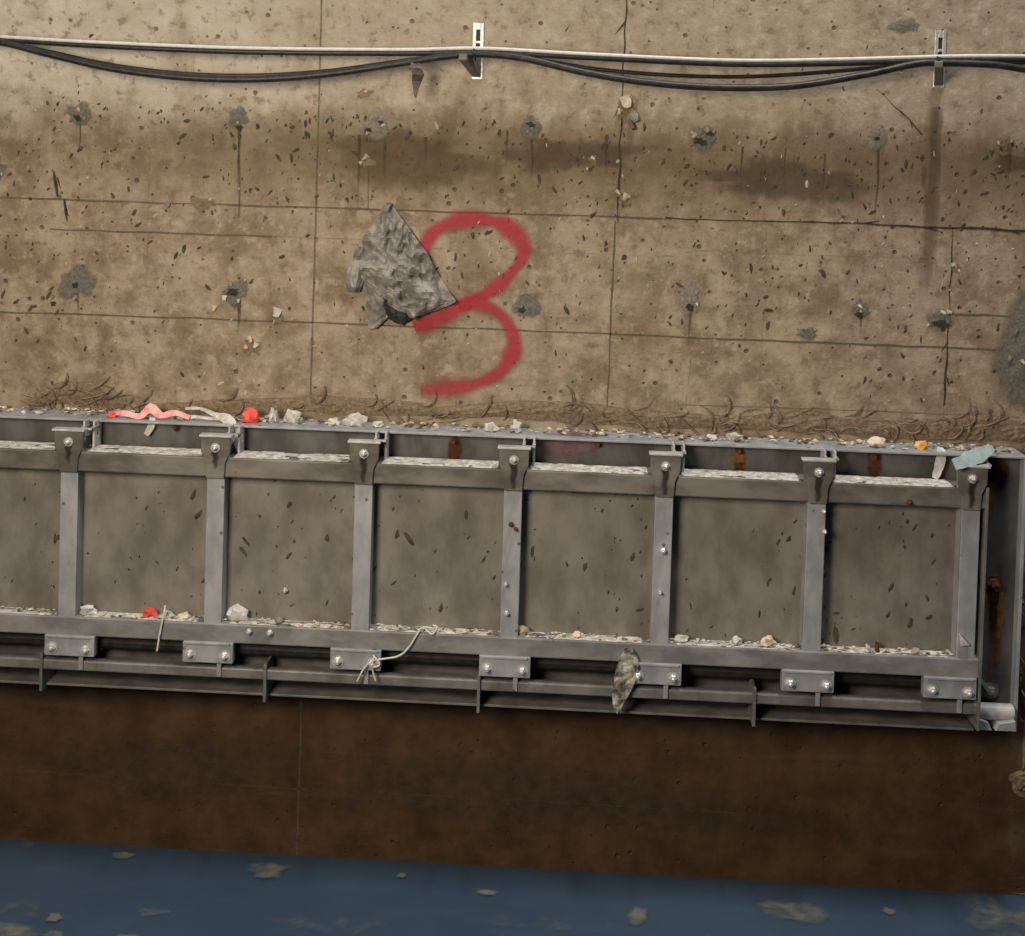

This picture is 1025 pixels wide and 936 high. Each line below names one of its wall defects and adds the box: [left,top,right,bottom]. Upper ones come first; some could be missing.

corrosion [731,441,746,471]
corrosion [868,446,882,477]
corrosion [985,588,1004,660]